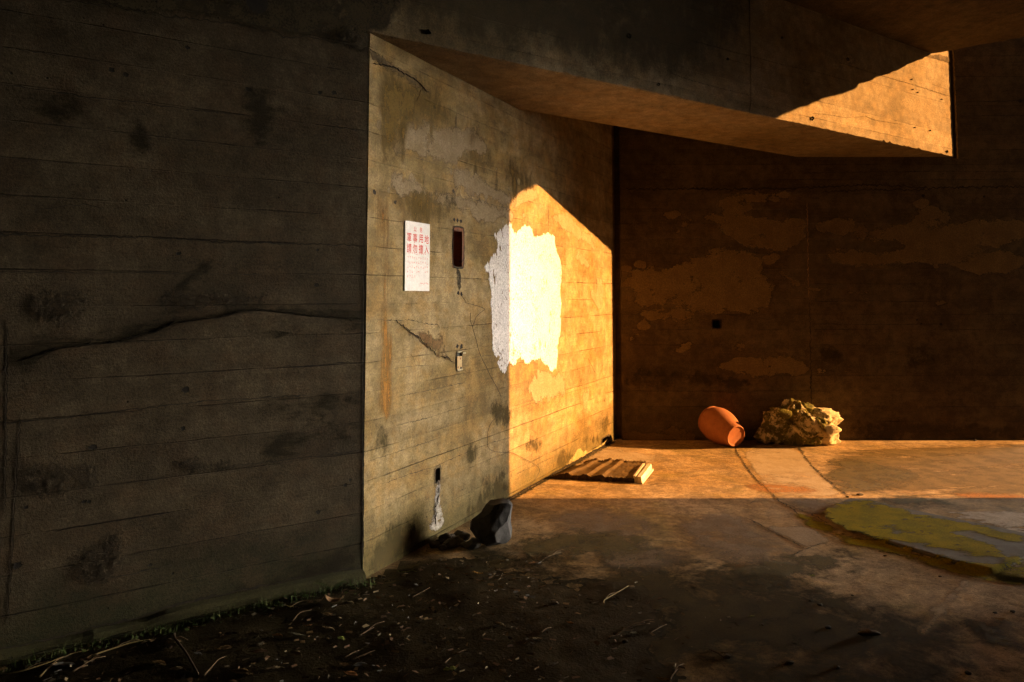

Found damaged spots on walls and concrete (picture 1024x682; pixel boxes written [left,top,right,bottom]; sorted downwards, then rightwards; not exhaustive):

peeling [621,246,777,330]
crack [26,308,440,360]
corrosion [380,282,391,420]
spalling [396,320,452,362]
peeling [718,355,810,379]
crack [798,446,853,495]
crack [734,446,829,557]